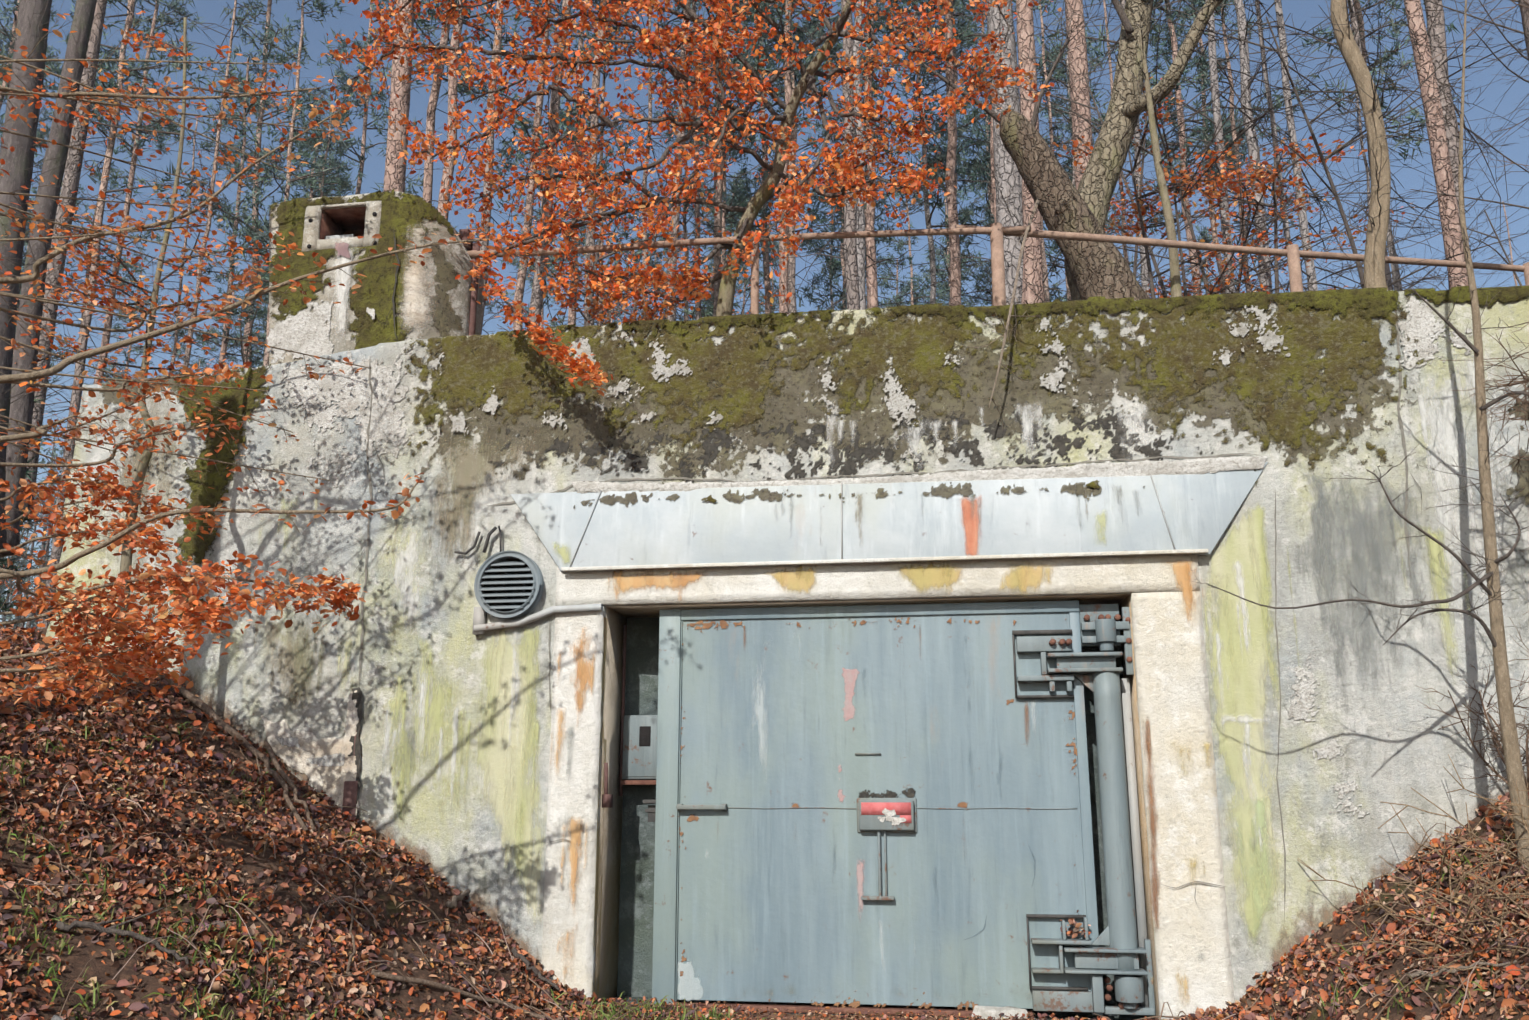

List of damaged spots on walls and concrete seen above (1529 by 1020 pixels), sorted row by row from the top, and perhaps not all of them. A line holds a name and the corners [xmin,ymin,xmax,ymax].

spalling [595,329,693,430]
spalling [881,360,922,428]
spalling [1036,317,1093,407]
damp [395,500,419,621]
rust [614,571,701,592]
rust [900,564,960,590]
rust [962,498,979,556]
damp [1312,360,1476,668]
damp [1488,395,1501,569]
peeling [261,690,360,815]
damp [385,644,470,817]
rust [561,722,607,996]